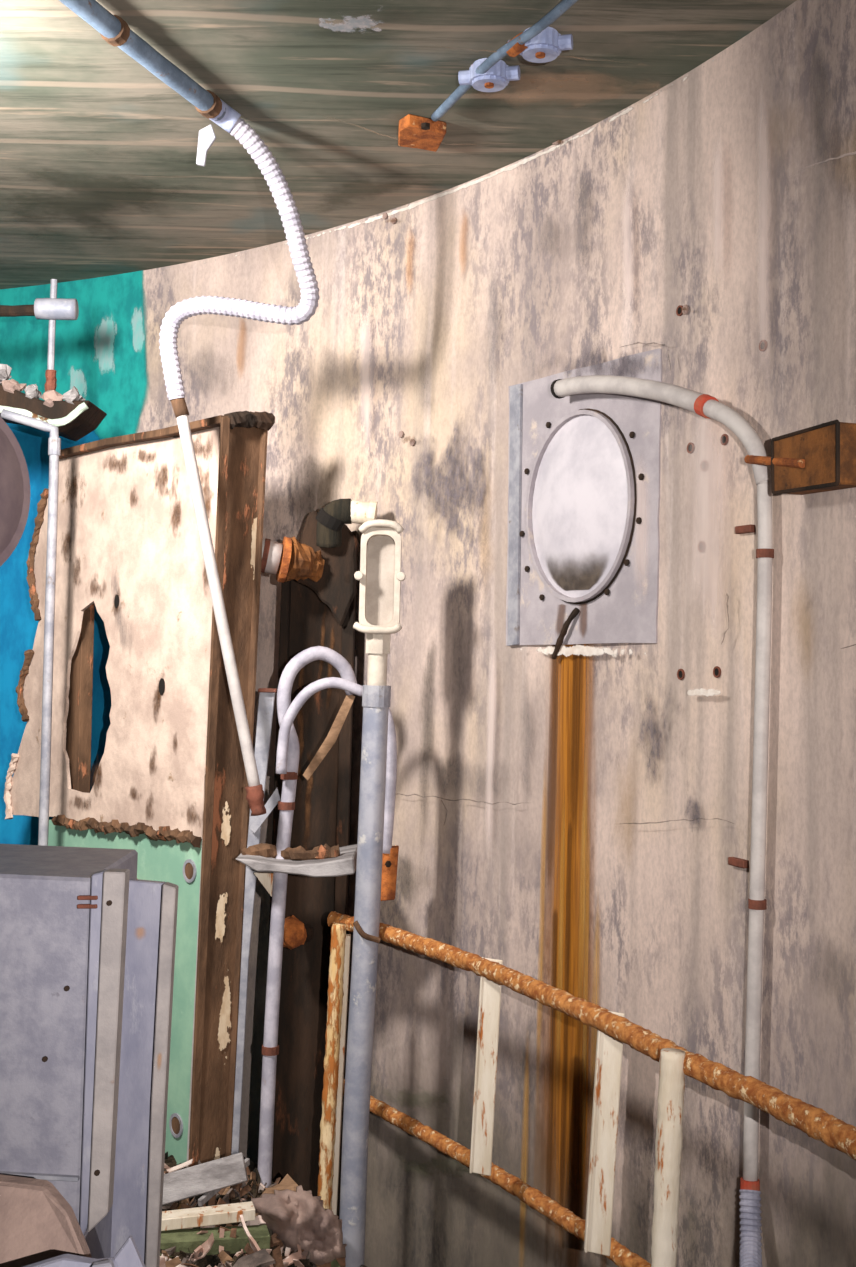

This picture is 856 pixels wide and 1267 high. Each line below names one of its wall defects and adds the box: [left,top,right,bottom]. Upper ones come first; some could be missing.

peeling [0,270,148,845]
damp [414,428,485,528]
corrosion [551,644,591,1002]
damp [640,702,666,775]
crack [623,817,732,825]
corrosion [545,1007,592,1212]